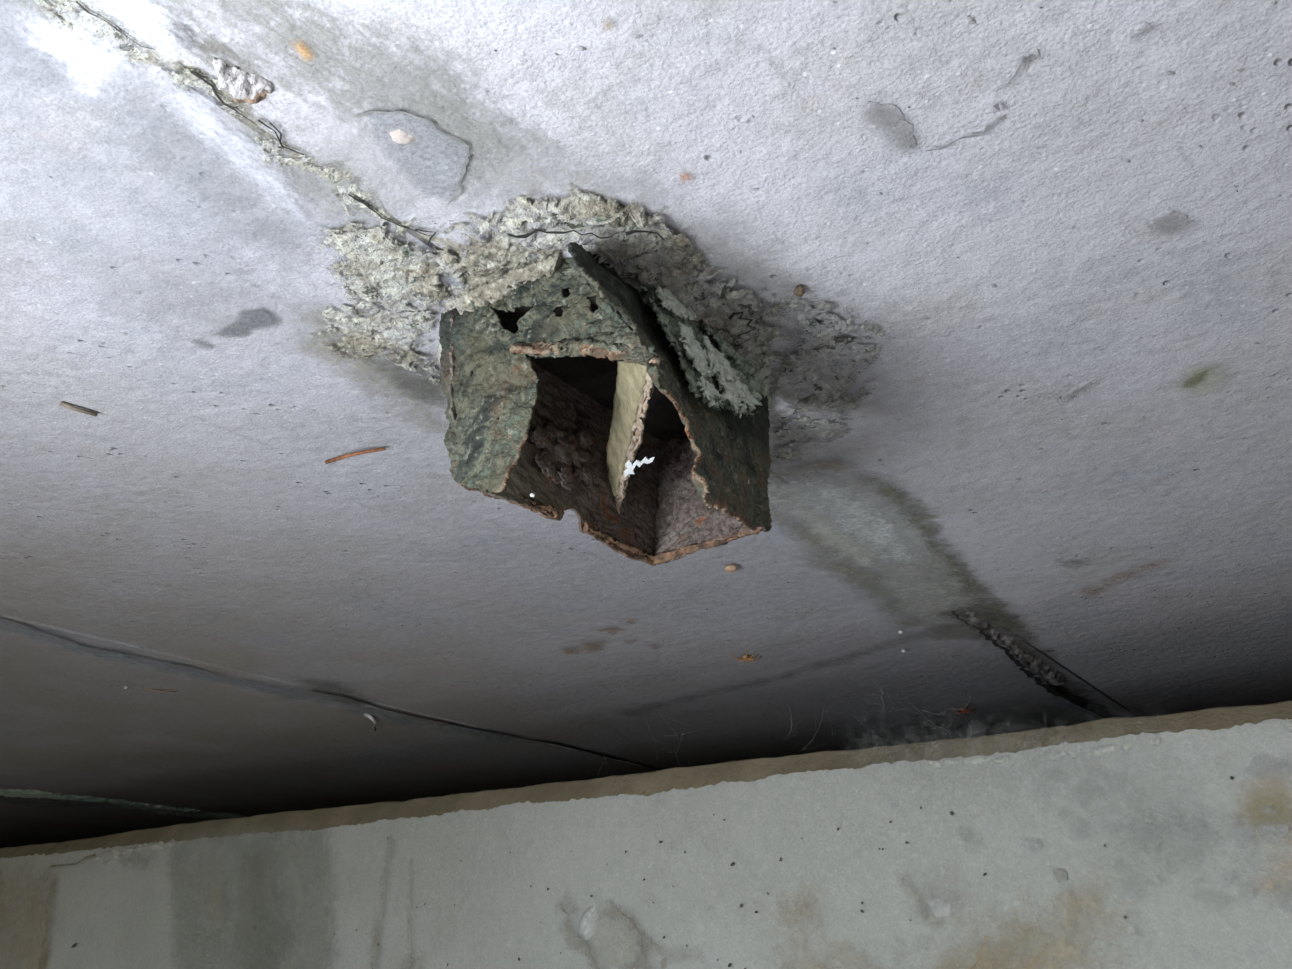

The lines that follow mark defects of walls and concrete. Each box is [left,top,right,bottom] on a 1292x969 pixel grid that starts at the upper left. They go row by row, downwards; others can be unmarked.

crack [32,0,458,251]
damp [173,90,374,217]
damp [95,0,540,189]
spalling [353,111,471,204]
damp [310,321,446,415]
spalling [309,183,889,477]
damp [767,463,1029,639]